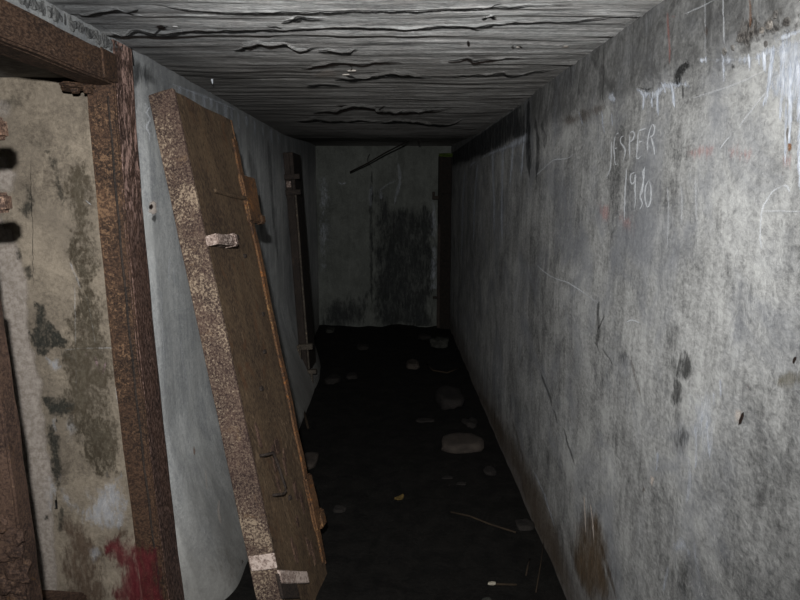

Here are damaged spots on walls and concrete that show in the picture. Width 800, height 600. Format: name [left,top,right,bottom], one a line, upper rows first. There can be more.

crack [78,3,638,127]
efflorescence [639,83,686,114]
efflorescence [745,31,800,183]
damp [29,165,118,475]
damp [375,202,434,326]
damp [48,425,61,486]
corrosion [64,522,102,600]
corrosion [574,498,609,600]